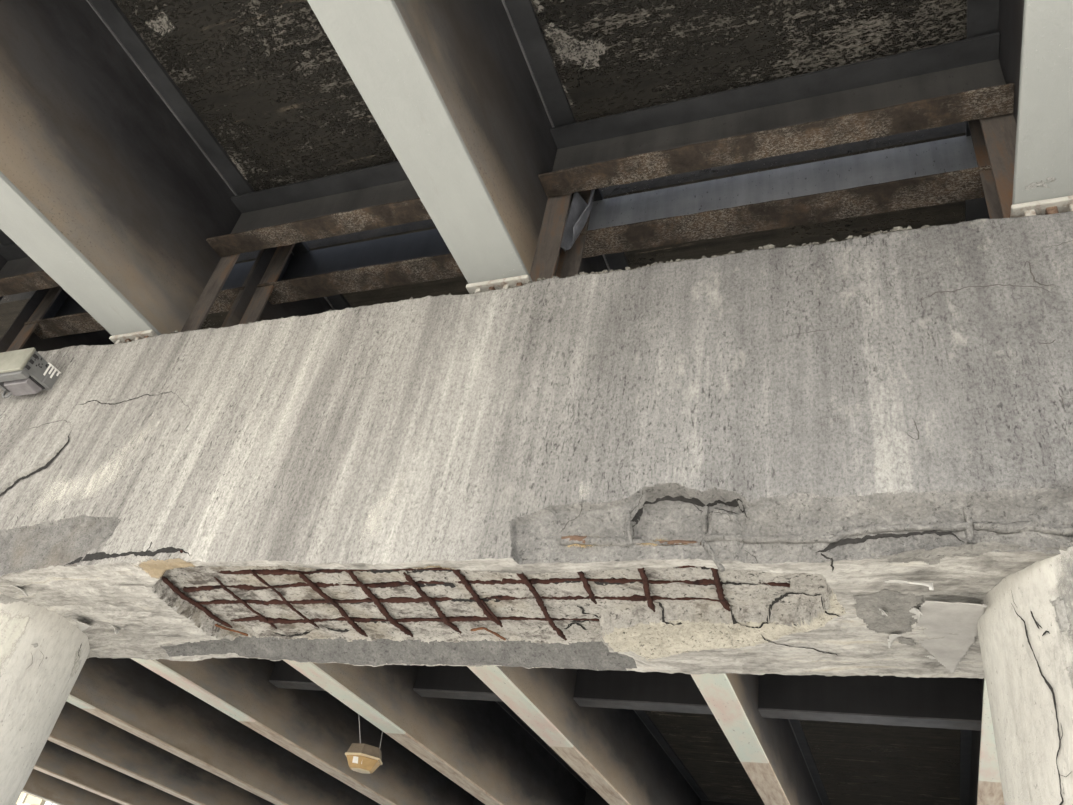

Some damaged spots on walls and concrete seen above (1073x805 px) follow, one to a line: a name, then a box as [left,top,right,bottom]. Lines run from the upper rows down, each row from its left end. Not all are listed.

crack [0,391,190,525]
peeling [0,594,20,605]
crack [66,542,190,565]
spalling [137,483,1073,673]
crack [1011,590,1070,805]